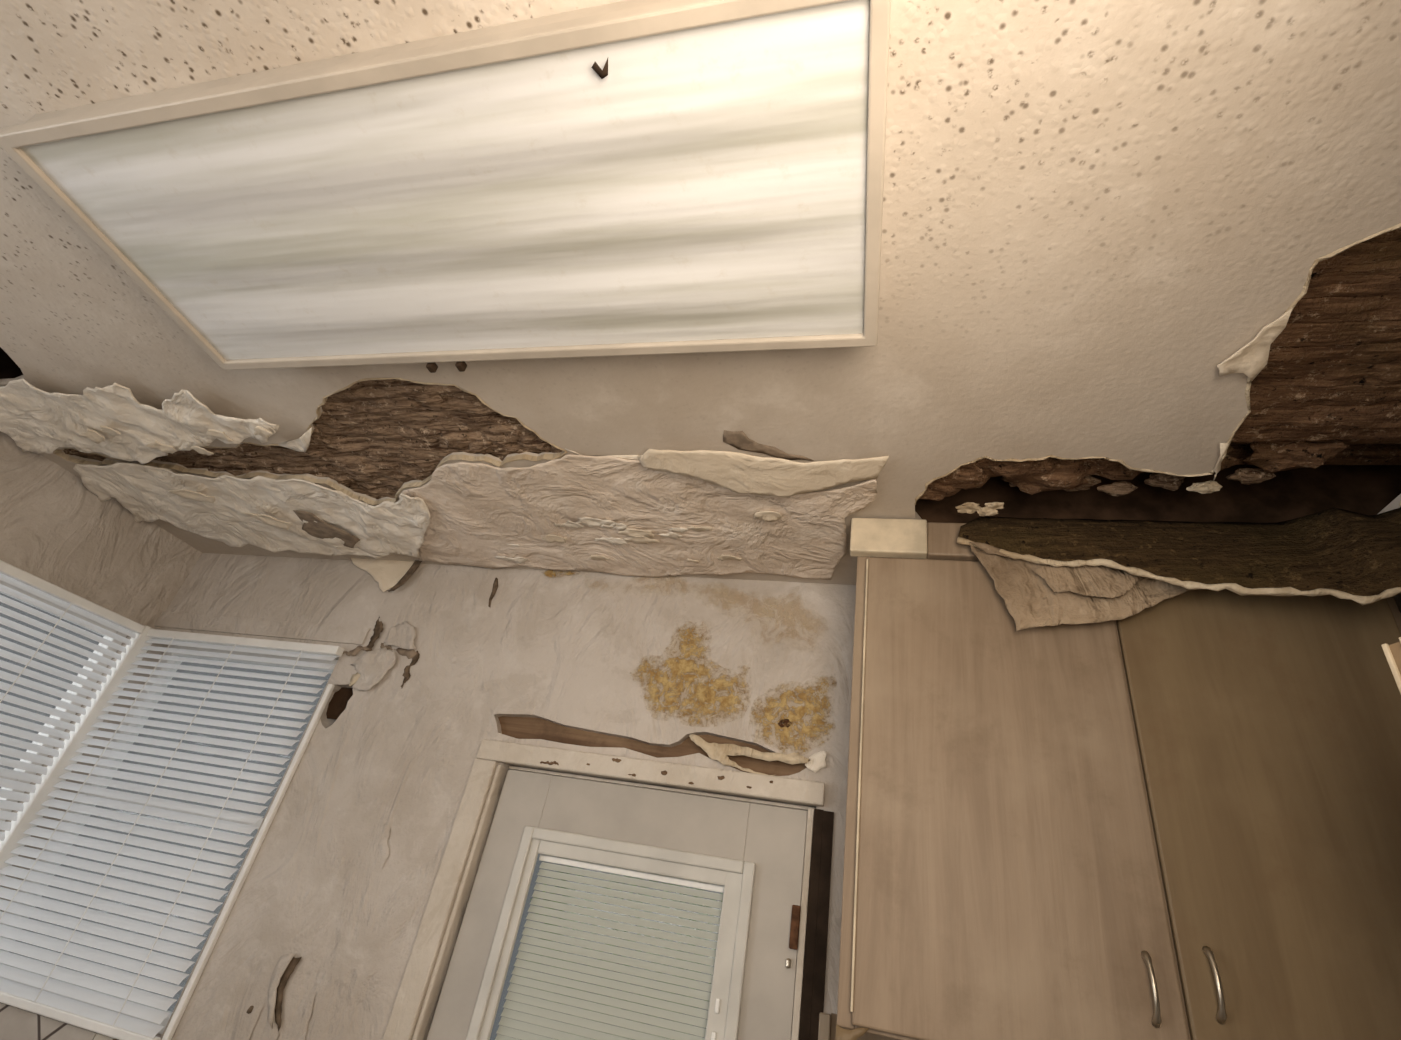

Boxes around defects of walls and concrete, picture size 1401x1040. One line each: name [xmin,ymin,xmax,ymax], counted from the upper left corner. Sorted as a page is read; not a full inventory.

peeling [1217,308,1292,381]
flaking render [0,379,889,592]
peeling [1213,442,1229,482]
spalling [326,672,360,720]
damp [636,628,836,754]
flaking render [498,716,827,789]